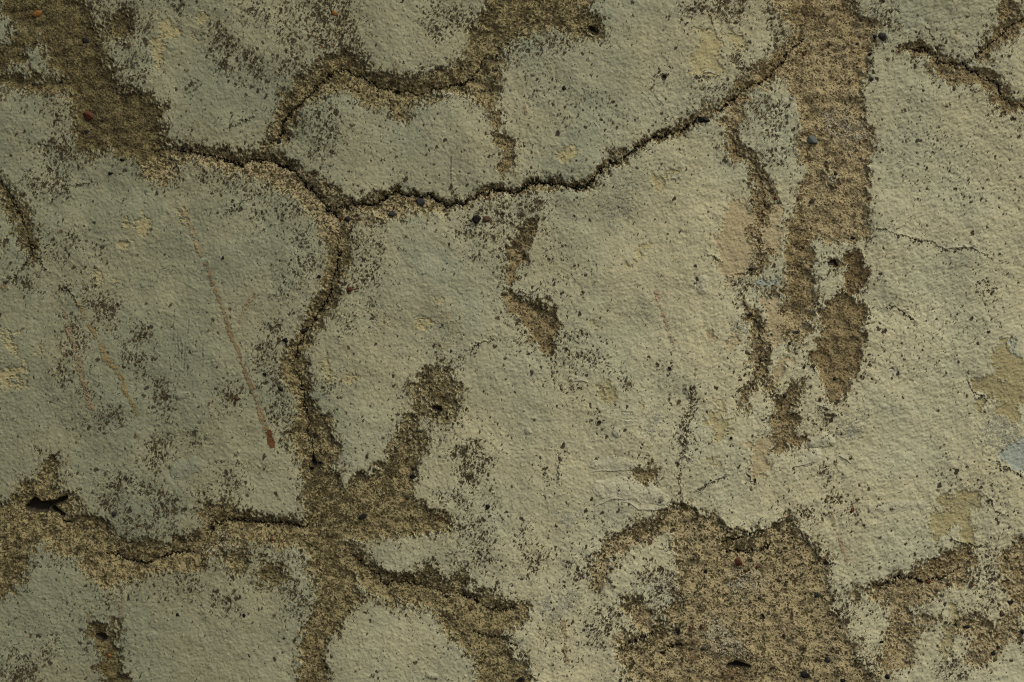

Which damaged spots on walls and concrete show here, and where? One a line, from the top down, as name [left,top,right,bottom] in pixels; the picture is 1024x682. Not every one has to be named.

spalling [678,0,753,24]
crack [896,20,1023,107]
crack [152,39,803,465]
crack [107,549,195,564]
crack [212,518,317,528]
spalling [511,489,1024,682]